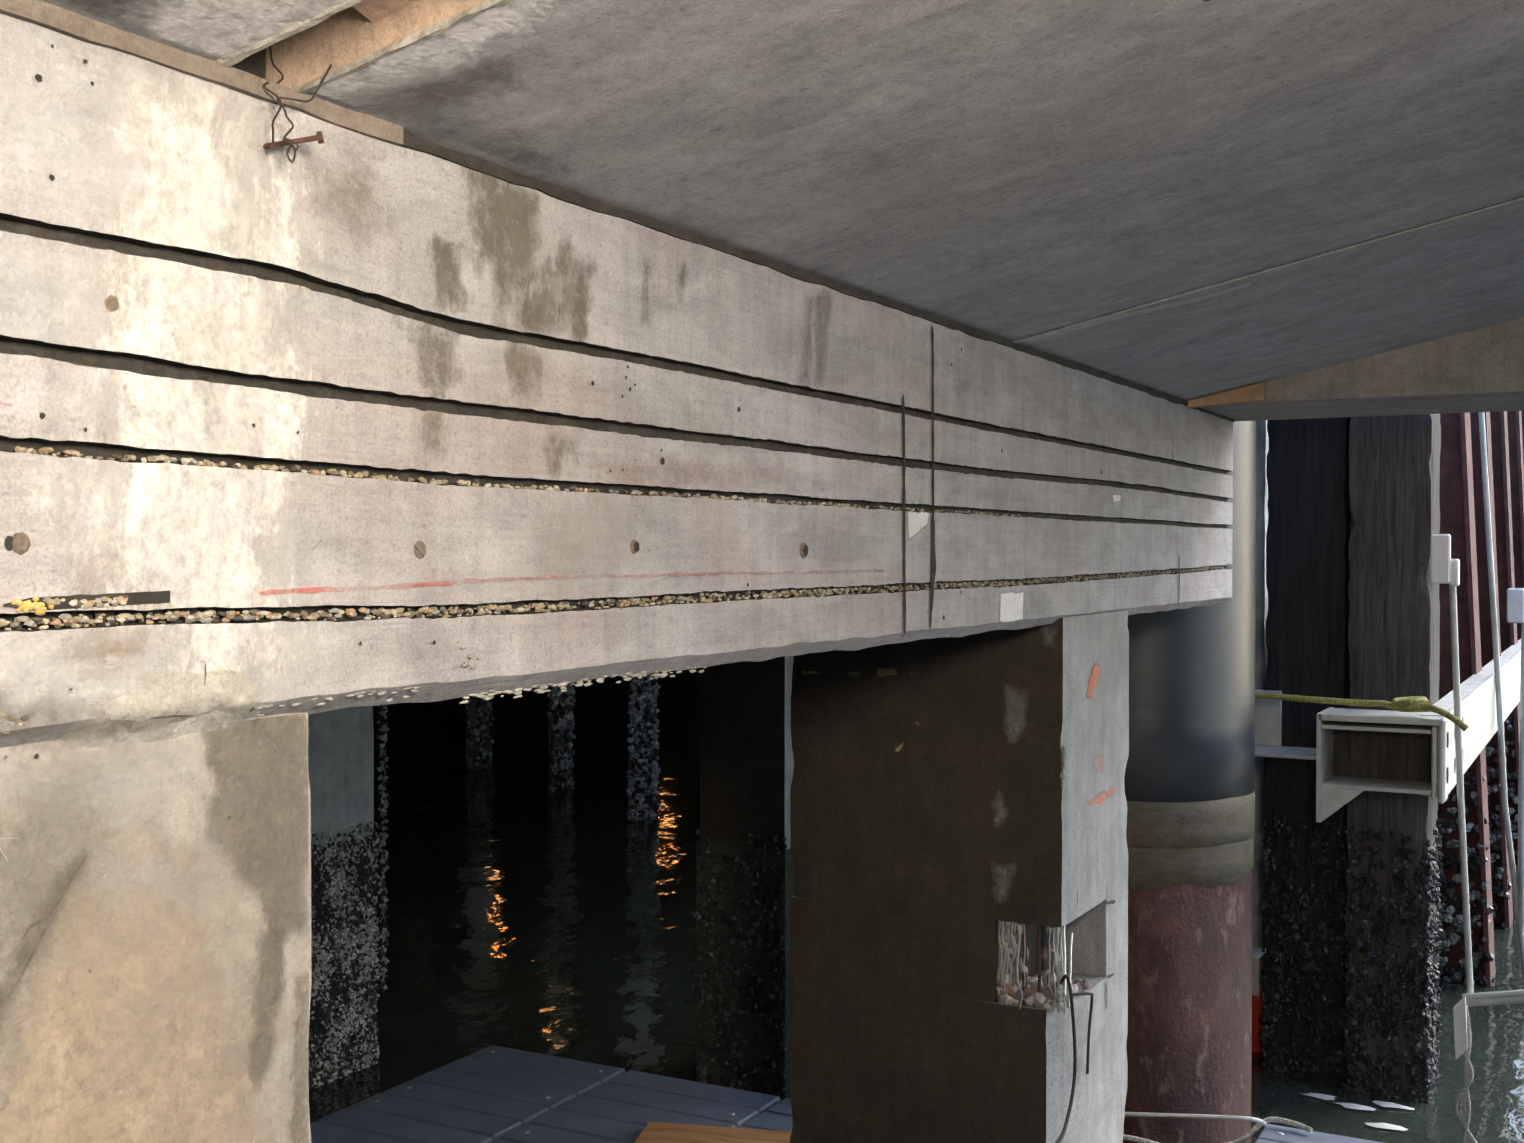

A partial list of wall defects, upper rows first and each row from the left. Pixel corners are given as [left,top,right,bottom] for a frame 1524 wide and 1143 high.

water stain [436,247,459,303]
water stain [468,170,591,341]
water stain [421,323,452,386]
spalling [14,446,1022,517]
spalling [0,566,1224,631]
spalling [996,921,1091,1014]